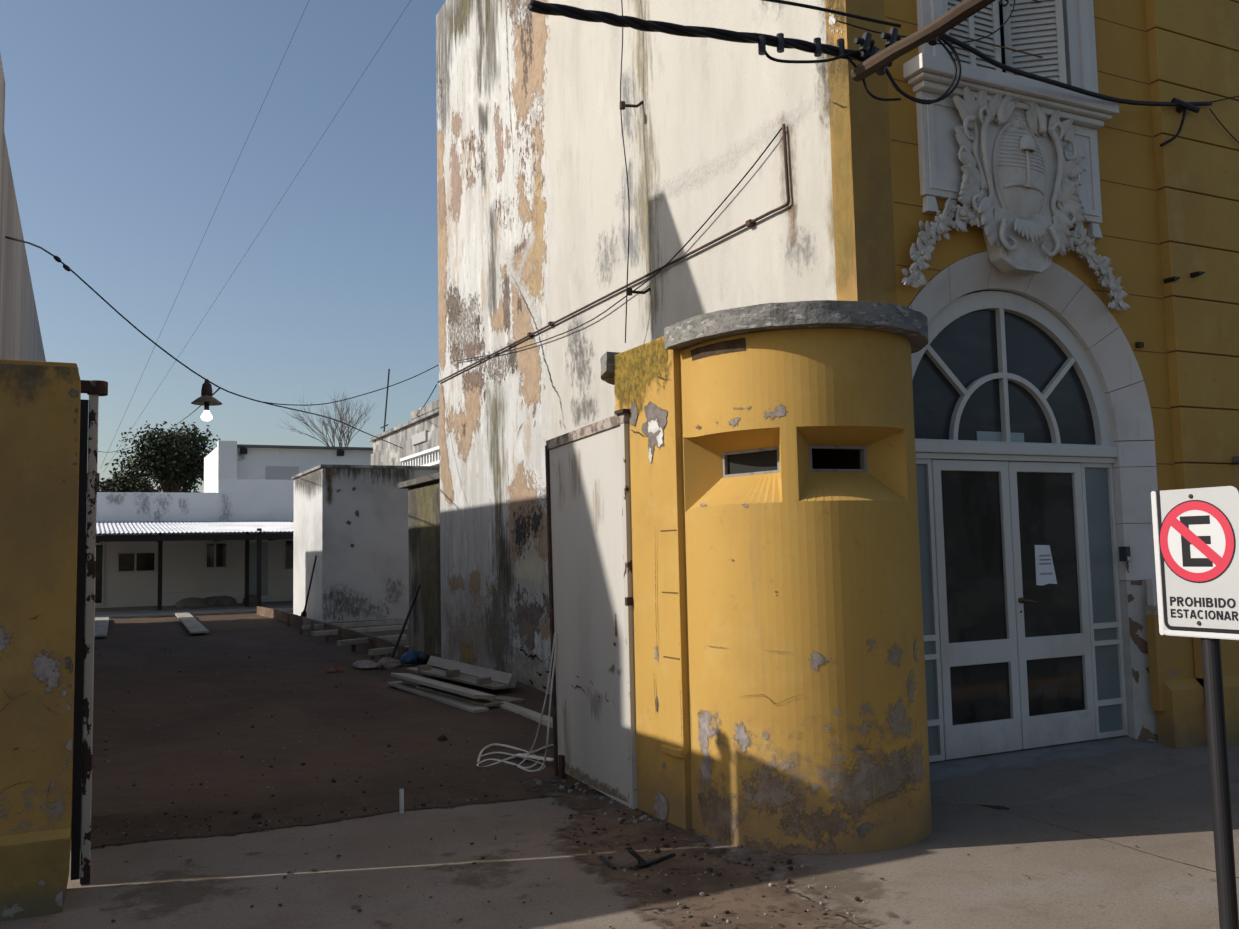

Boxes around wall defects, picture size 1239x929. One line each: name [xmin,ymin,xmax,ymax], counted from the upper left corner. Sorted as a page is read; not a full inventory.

water stain [436,0,502,137]
water stain [819,36,852,279]
peeling [437,0,550,510]
spalling [630,401,667,463]
spalling [31,649,73,712]
water stain [295,468,418,556]
water stain [434,489,546,671]
peeling [506,460,550,654]
spalling [808,652,832,672]
peeling [849,639,918,740]
peeling [1126,561,1150,684]
peeling [697,710,873,855]